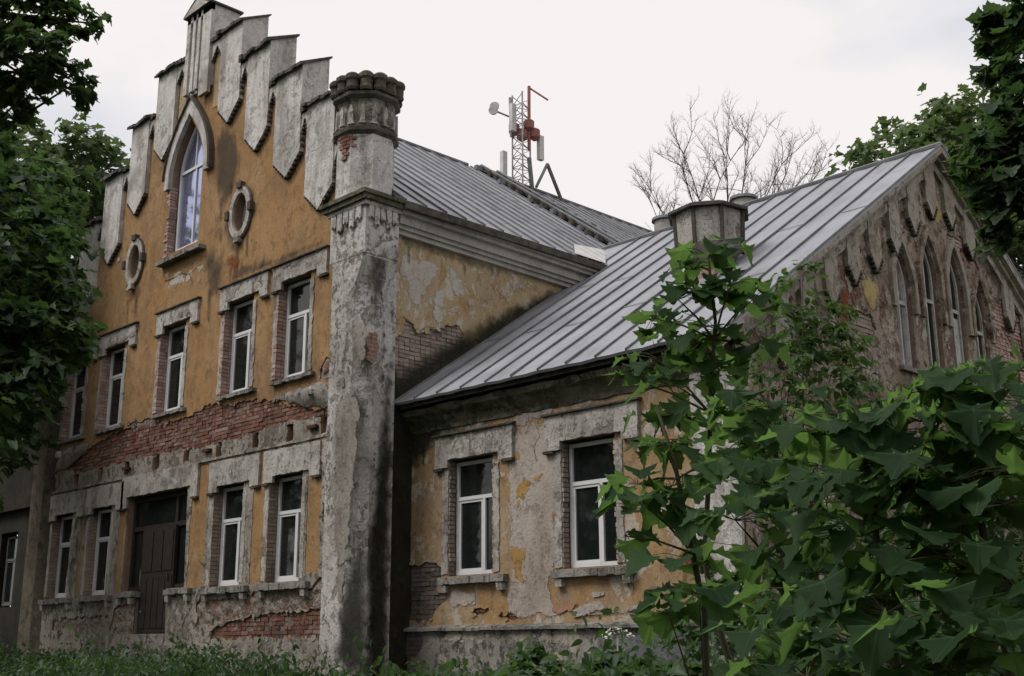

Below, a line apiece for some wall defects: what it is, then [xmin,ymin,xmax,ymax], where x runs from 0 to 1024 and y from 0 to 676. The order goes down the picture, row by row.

flaking render [395,251,529,379]